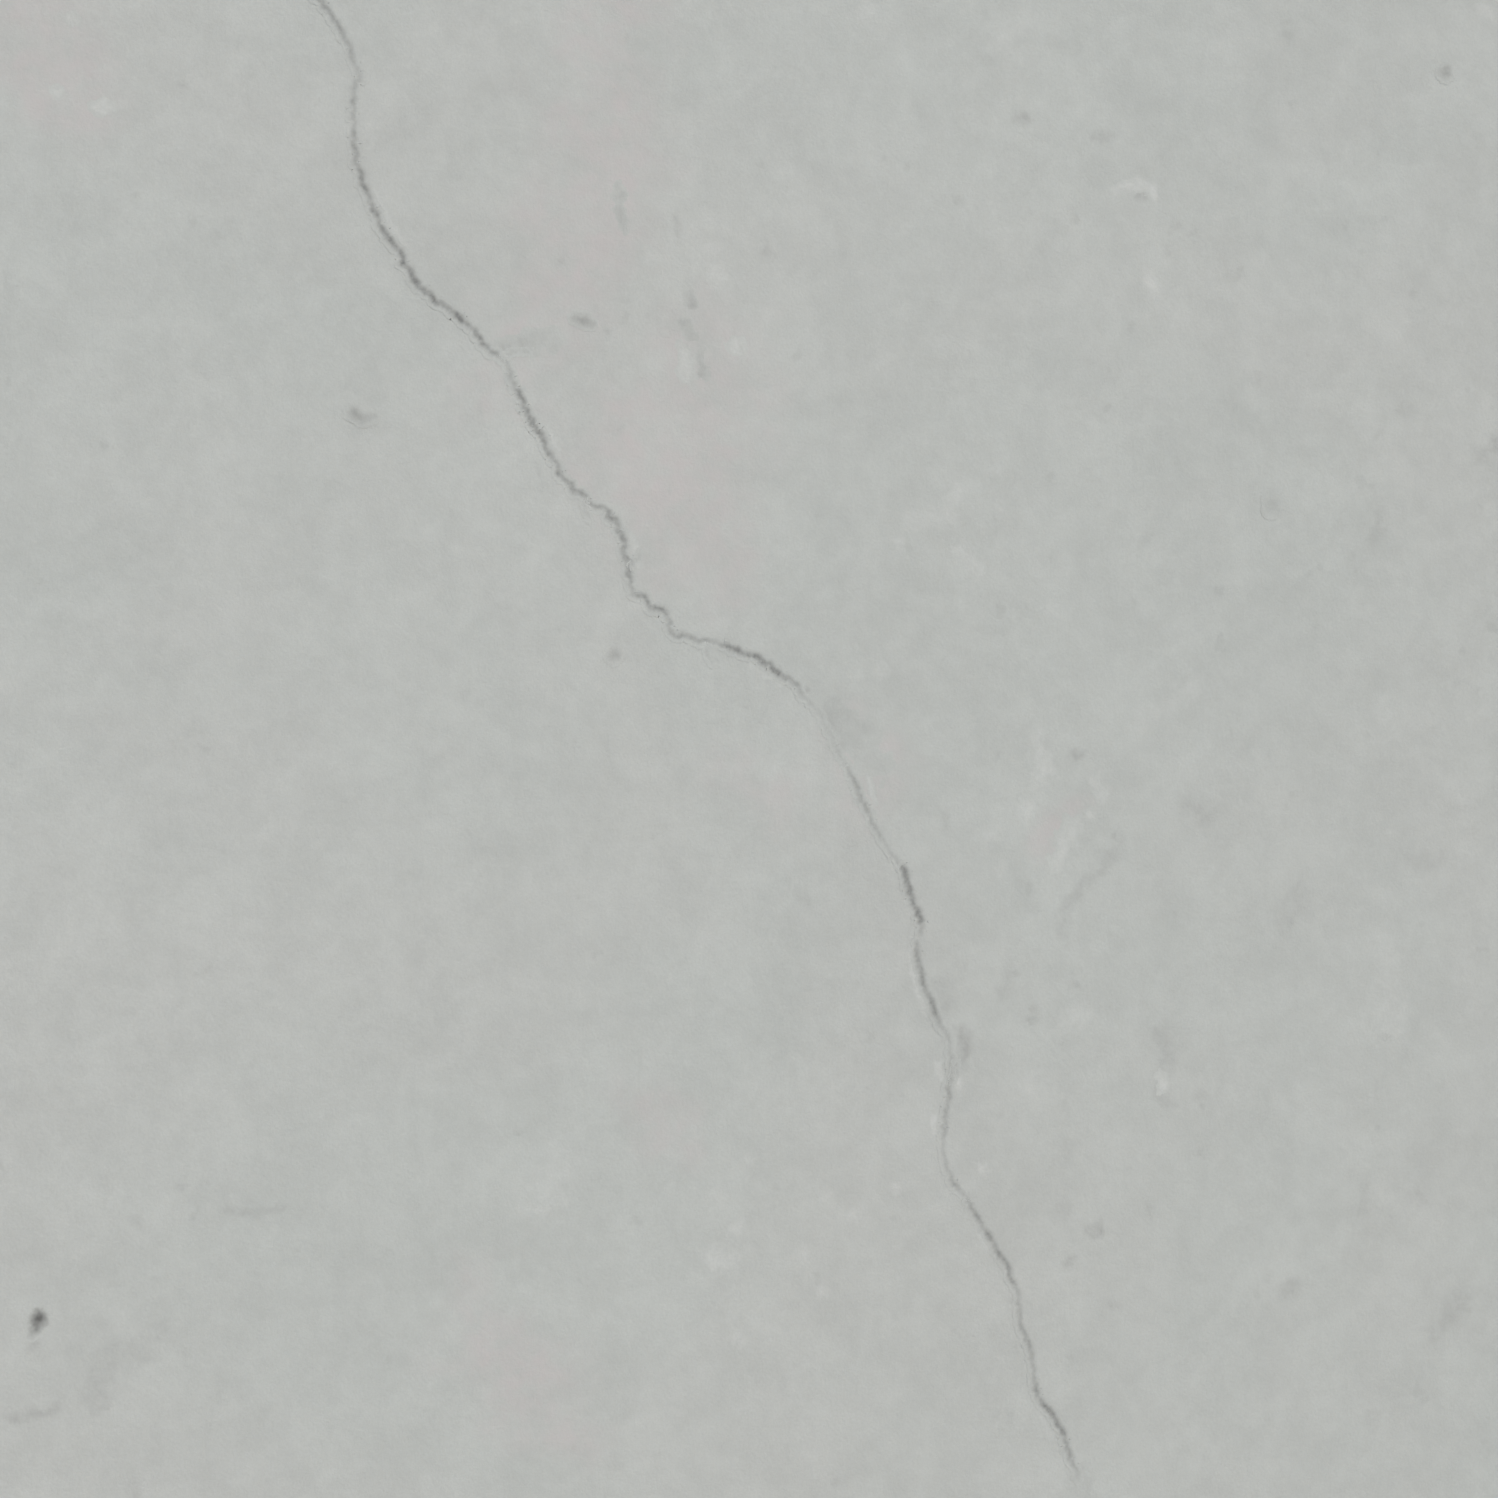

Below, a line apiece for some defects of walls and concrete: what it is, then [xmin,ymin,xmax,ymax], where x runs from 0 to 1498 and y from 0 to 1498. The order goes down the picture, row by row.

crack [308,0,1084,1486]